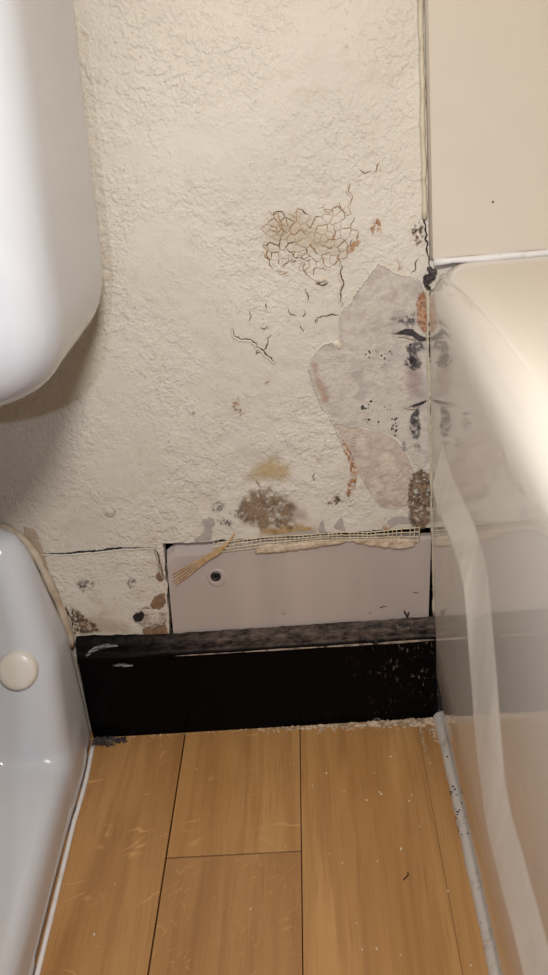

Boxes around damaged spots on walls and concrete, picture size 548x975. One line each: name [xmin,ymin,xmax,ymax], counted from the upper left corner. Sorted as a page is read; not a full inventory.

crack [229,163,379,365]
peeling [307,262,428,469]
water stain [213,488,311,535]
water stain [408,469,430,531]
spalling [23,527,48,570]
spalling [133,593,168,635]